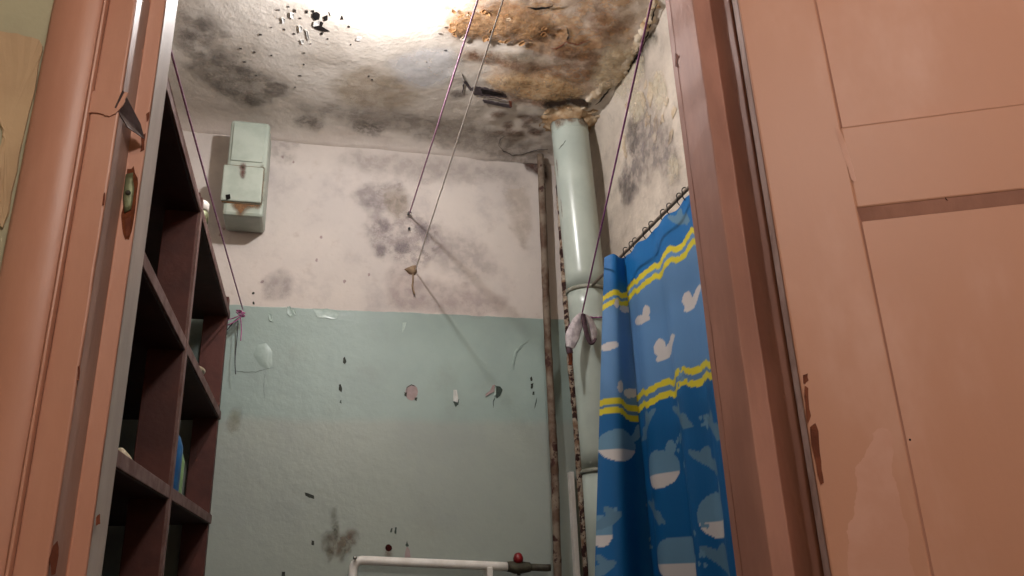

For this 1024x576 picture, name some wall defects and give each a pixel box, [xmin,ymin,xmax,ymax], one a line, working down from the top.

peeling [259,6,362,88]
flaking render [438,9,548,46]
damp [458,0,630,107]
spalling [452,74,512,108]
spalling [539,95,600,134]
peeling [616,56,677,158]
damp [620,116,671,201]
peeling [404,384,418,401]
peeling [486,385,502,407]